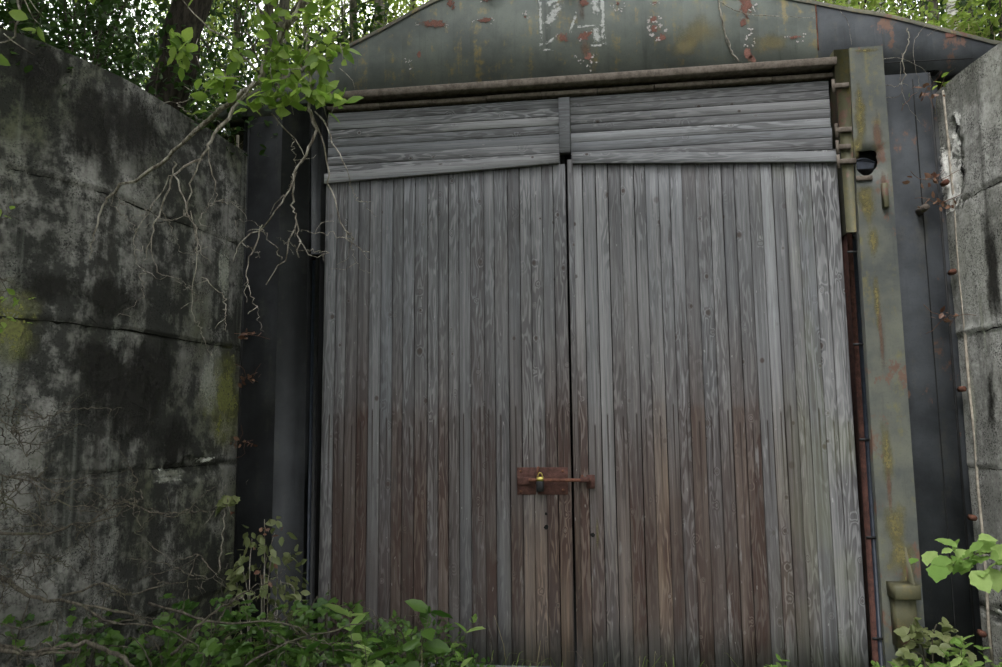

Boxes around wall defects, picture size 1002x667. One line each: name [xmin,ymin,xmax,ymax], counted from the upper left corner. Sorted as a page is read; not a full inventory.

peeling [647,2,667,42]
peeling [739,0,757,63]
crack [0,316,235,353]